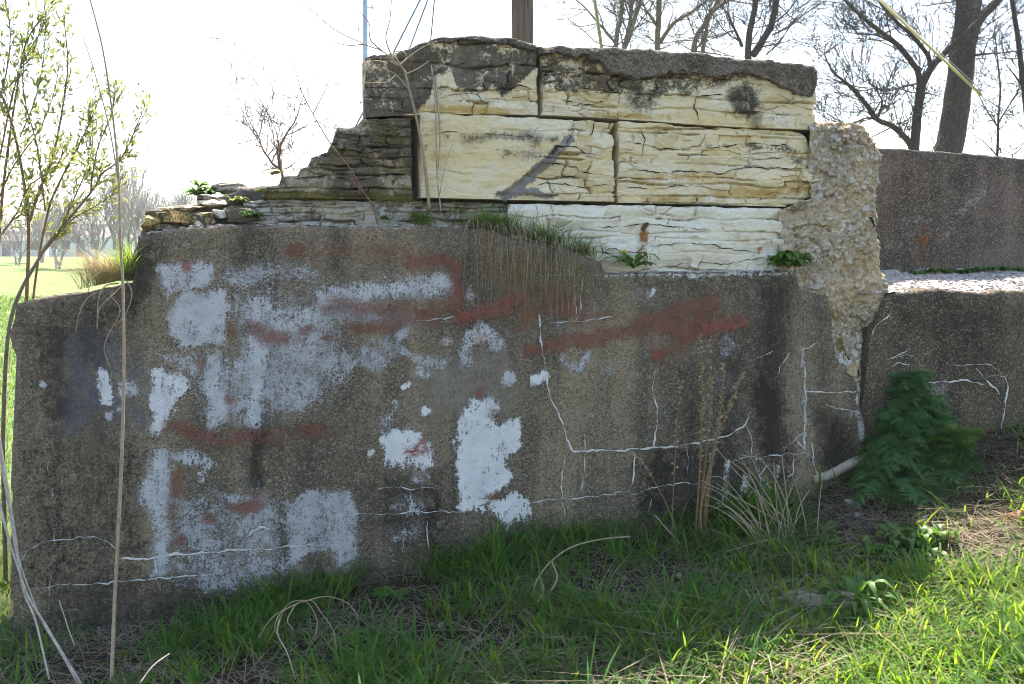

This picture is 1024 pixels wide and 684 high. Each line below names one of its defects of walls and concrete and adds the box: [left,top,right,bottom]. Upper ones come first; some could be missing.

corrosion [640,222,649,252]
crack [533,223,860,517]
spalling [849,380,865,441]
crack [891,350,1009,428]
crack [23,447,324,612]